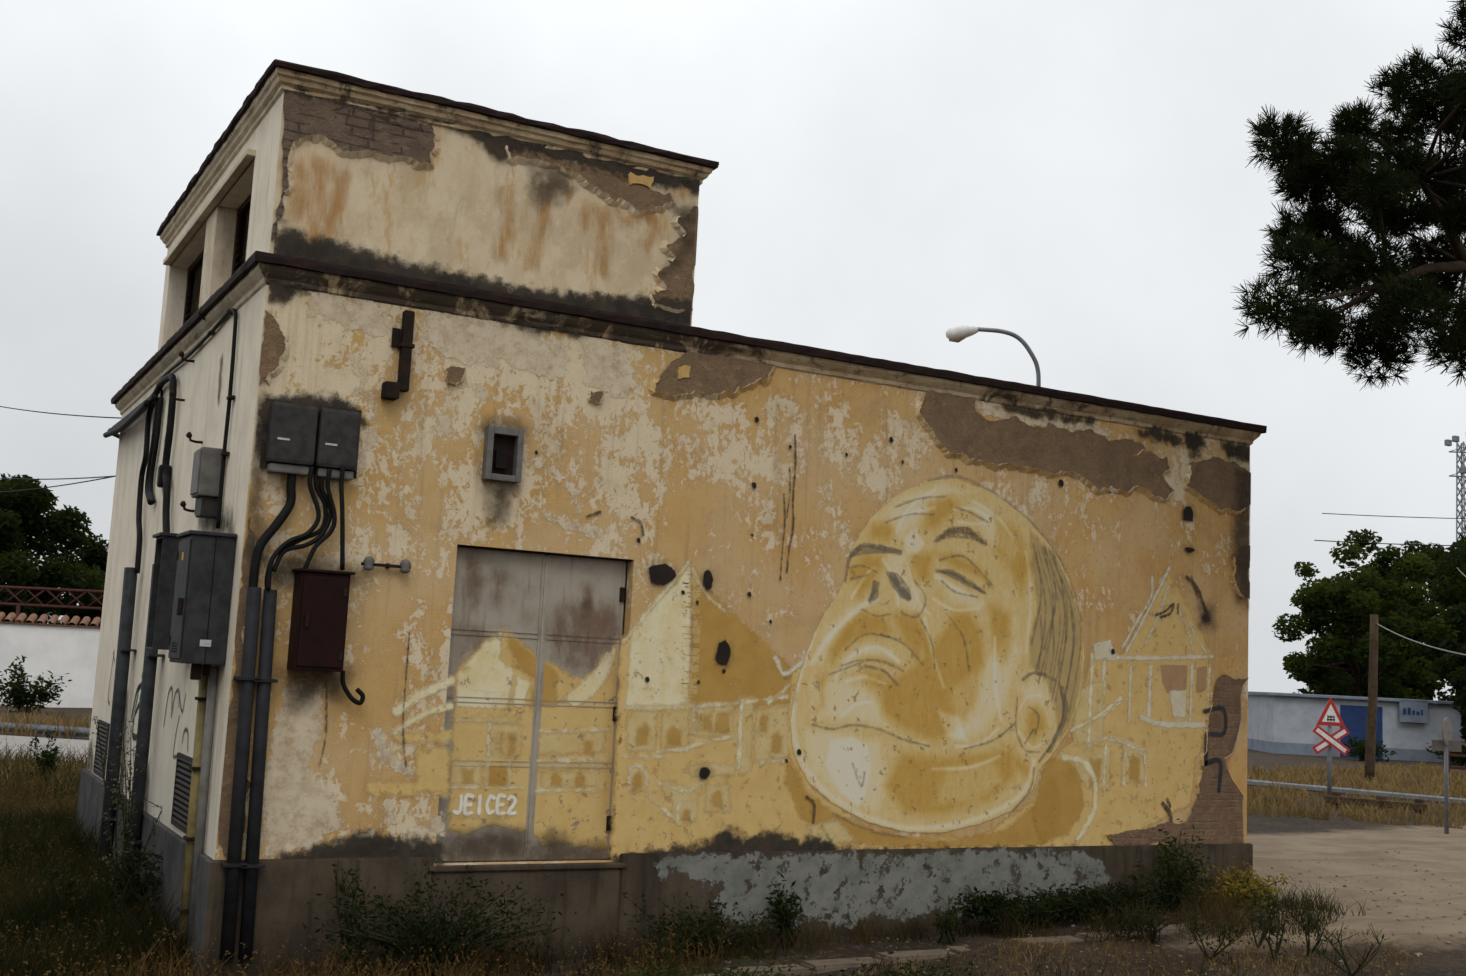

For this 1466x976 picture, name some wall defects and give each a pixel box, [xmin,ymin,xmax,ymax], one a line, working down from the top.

flaking render [271,90,441,241]
leakage [294,88,700,246]
flaking render [259,310,290,386]
peeling [306,291,392,337]
leakage [268,227,692,326]
leakage [504,319,584,338]
peeling [422,310,776,405]
leakage [1004,402,1095,424]
flaking render [914,390,1251,521]
spalling [649,564,713,605]
flaking render [1105,674,1248,846]
peeling [654,845,1114,932]